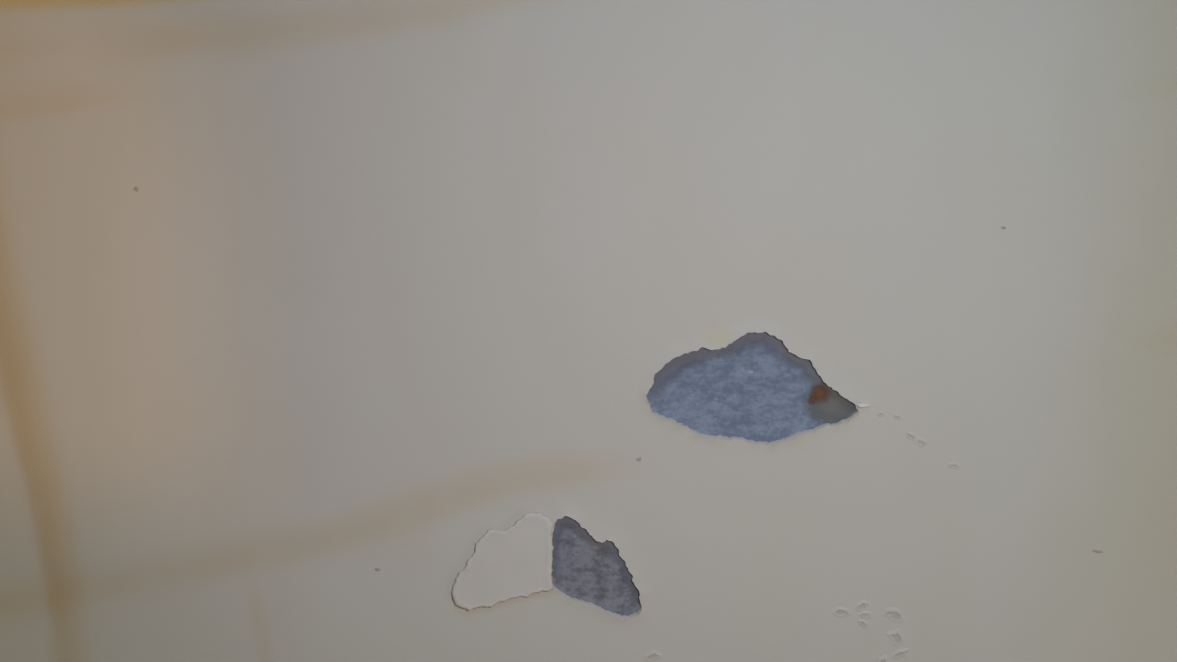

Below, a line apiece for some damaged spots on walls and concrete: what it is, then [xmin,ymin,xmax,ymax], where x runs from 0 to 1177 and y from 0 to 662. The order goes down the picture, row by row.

peeling [633,314,869,465]
corrosion [810,385,827,403]
peeling [452,498,662,638]